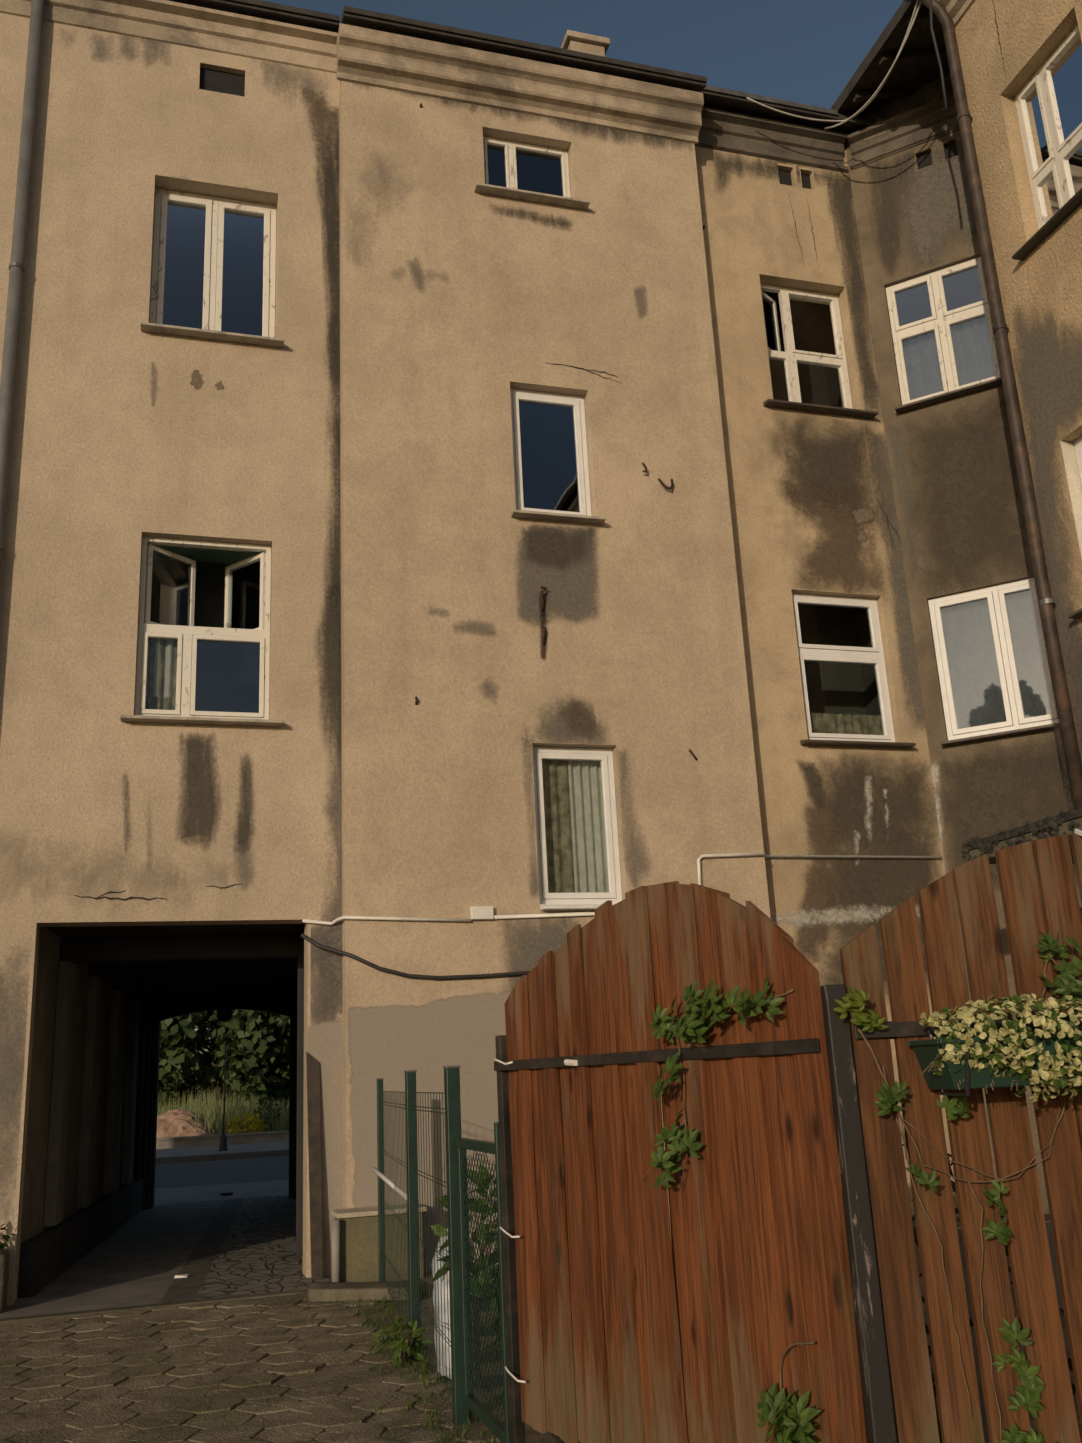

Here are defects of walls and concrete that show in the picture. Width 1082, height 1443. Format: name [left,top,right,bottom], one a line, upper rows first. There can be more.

crack [545,362,620,383]
damp [270,68,342,1020]
damp [518,526,597,625]
damp [774,316,1082,988]
damp [542,702,602,744]
damp [180,736,217,844]
damp [236,760,252,882]
crack [73,890,168,901]